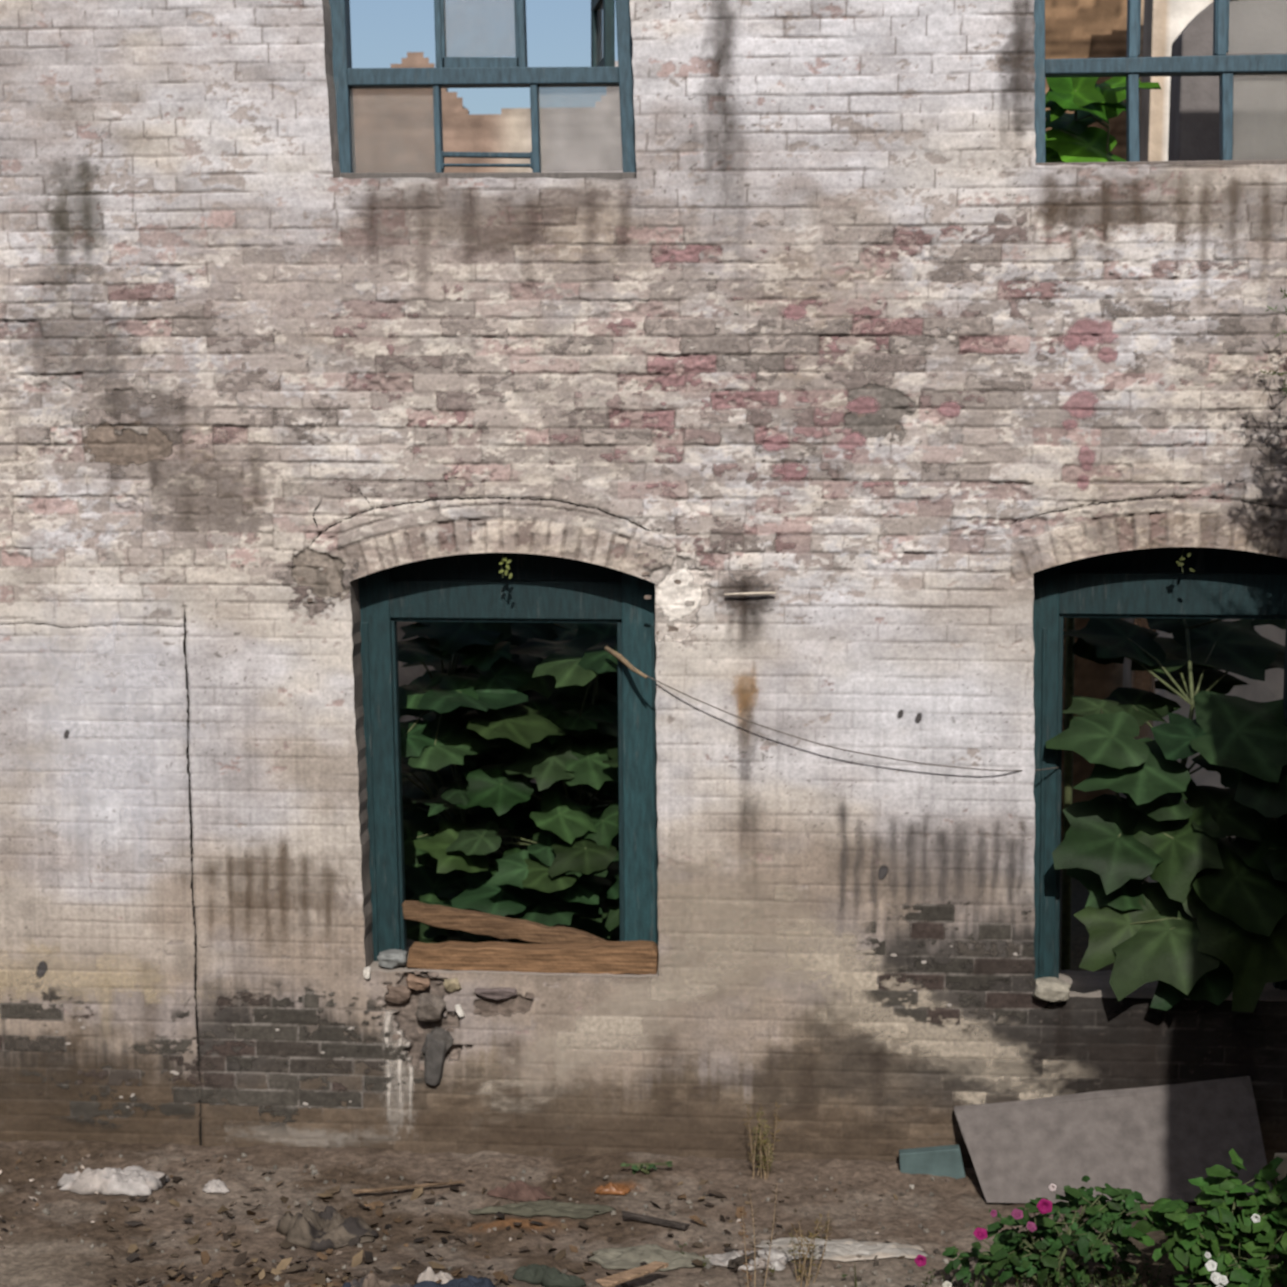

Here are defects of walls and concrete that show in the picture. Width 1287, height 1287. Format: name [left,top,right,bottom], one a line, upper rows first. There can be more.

crack [1,611,208,1146]
peeling [0,961,93,1052]
peeling [26,970,534,1127]
damp [385,1013,413,1104]
damp [556,1016,643,1049]
damp [651,936,752,1002]
damp [773,919,1053,1104]
peeling [864,902,1052,1031]